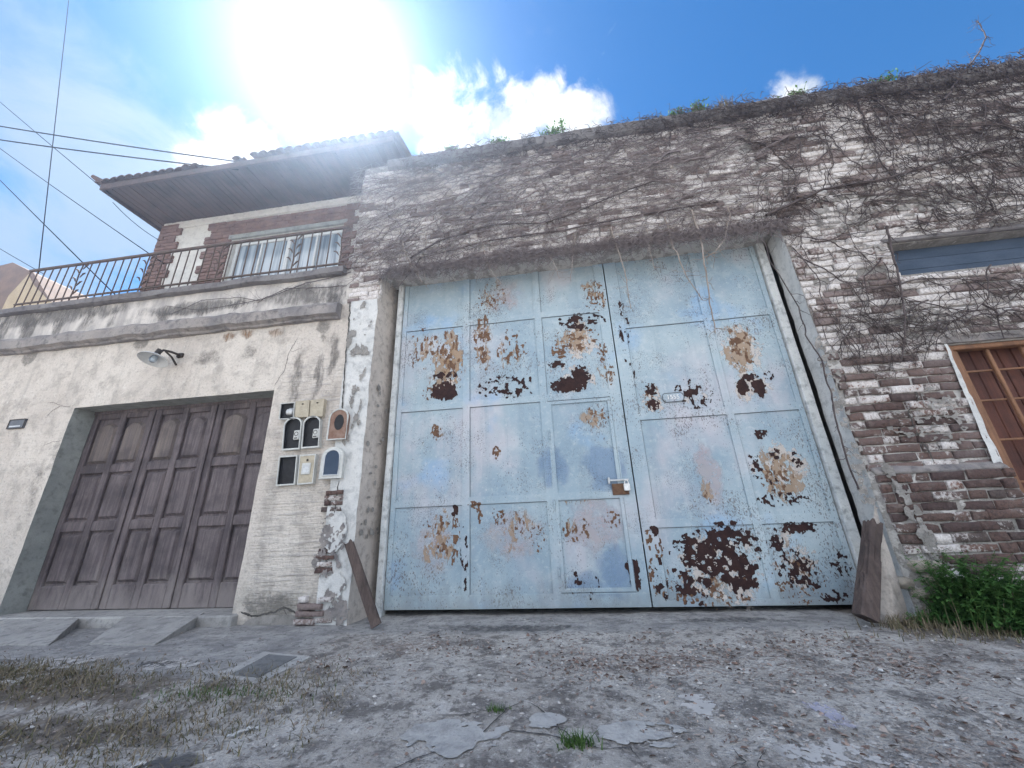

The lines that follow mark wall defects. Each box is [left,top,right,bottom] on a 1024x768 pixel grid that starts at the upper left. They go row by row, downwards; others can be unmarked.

rust [409,282,527,401]
rust [547,280,616,393]
rust [641,383,664,413]
rust [674,379,713,409]
rust [720,324,774,403]
rust [748,430,810,507]
peeling [243,465,382,626]
rust [423,505,461,566]
rust [490,509,546,553]
rust [645,520,826,610]